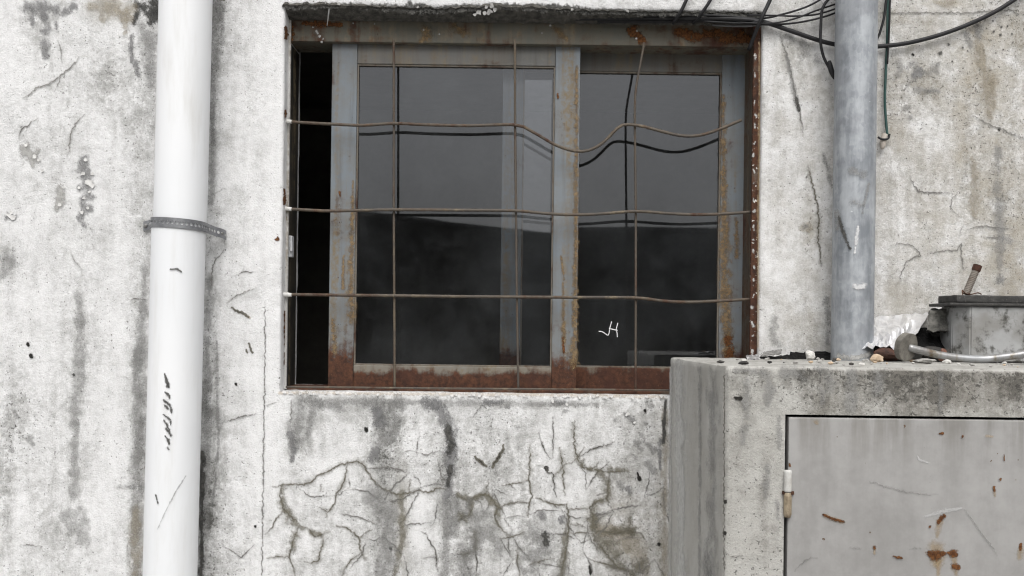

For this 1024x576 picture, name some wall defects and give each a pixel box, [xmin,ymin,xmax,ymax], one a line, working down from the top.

crack [27,44,78,96]
crack [780,37,803,127]
crack [809,171,822,265]
crack [896,181,1008,279]
damp [367,397,404,463]
crack [228,311,669,576]
rust [927,549,961,570]